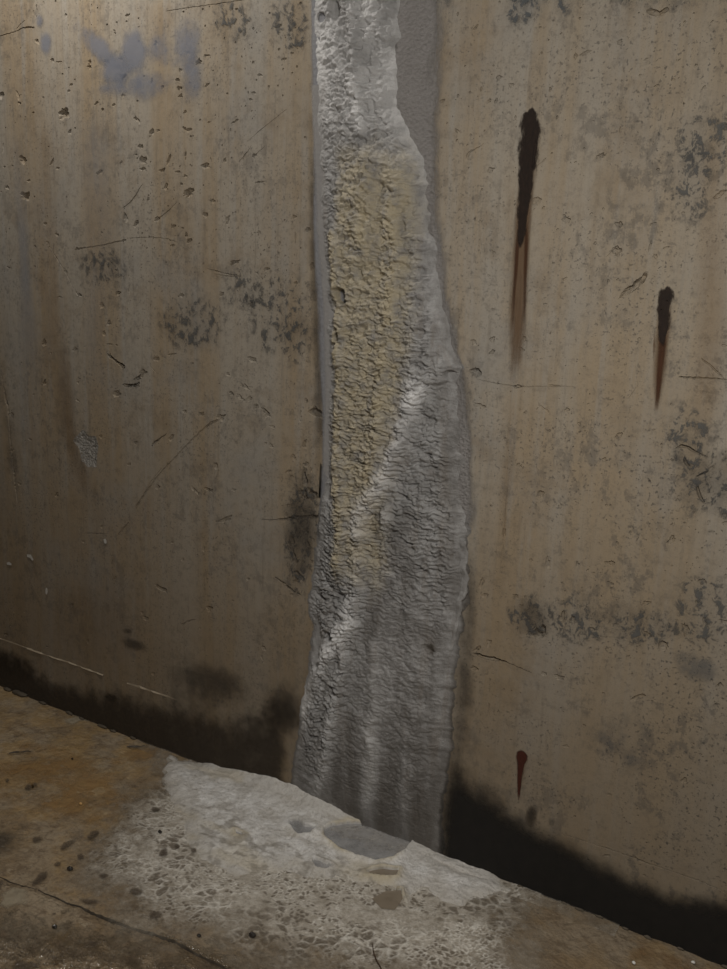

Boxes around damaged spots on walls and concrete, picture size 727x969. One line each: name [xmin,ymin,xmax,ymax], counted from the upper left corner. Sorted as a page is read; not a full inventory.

corrosion [511,108,540,356]
corrosion [653,286,674,402]
water stain [0,652,727,969]
corrosion [516,751,527,797]
crack [0,873,234,969]